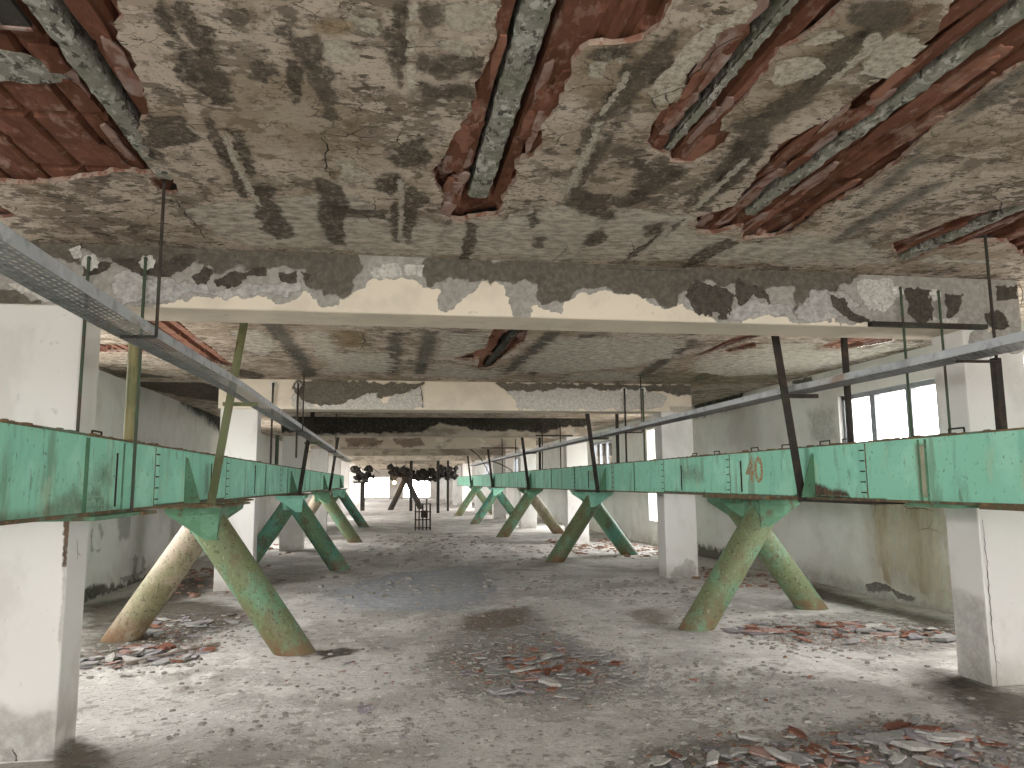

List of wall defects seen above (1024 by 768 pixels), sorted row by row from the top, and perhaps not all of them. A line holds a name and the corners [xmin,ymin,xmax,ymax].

spalling [0,0,178,194]
crack [319,126,407,180]
water stain [31,0,999,323]
spalling [432,0,672,221]
spalling [646,0,845,163]
spalling [695,0,1024,240]
water stain [959,72,1023,120]
water stain [0,283,50,304]
peeling [825,274,1022,344]
water stain [984,285,1018,330]
rust [62,521,70,567]
crack [982,520,999,682]